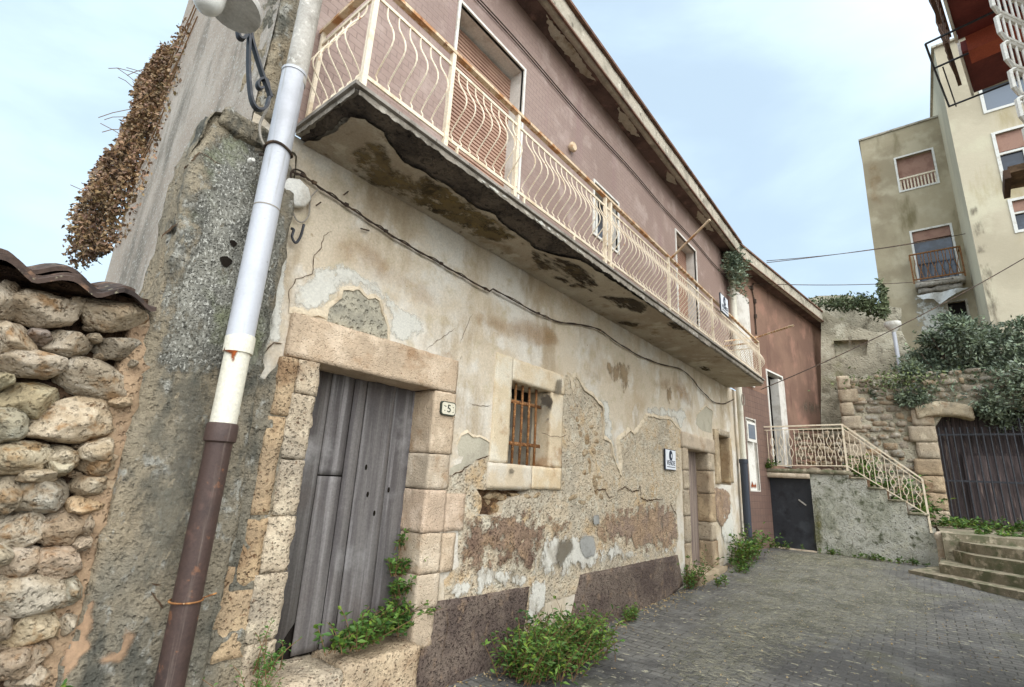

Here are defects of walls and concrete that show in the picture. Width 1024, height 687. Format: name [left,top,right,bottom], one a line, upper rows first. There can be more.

leakage [353,143,515,242]
spalling [295,88,710,346]
crack [289,231,331,303]
peeling [266,260,390,351]
leakage [607,362,629,393]
peeling [444,371,682,624]